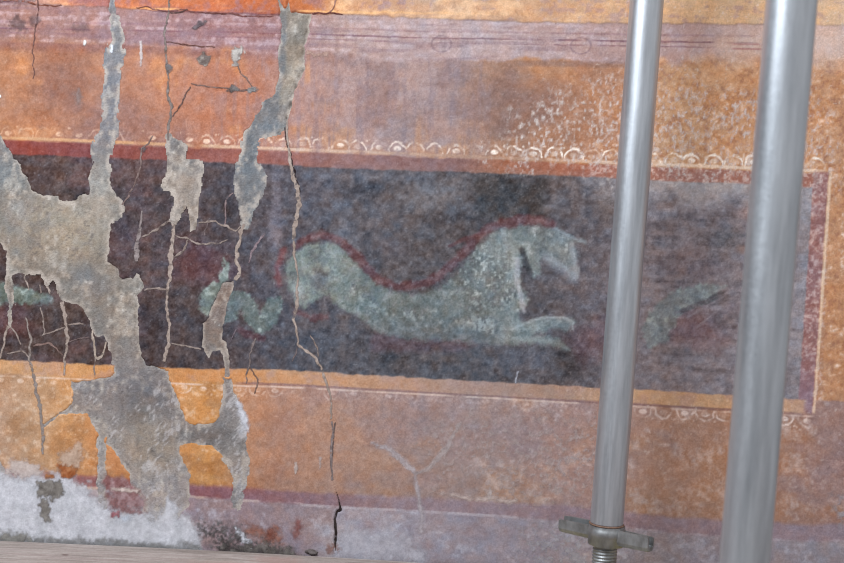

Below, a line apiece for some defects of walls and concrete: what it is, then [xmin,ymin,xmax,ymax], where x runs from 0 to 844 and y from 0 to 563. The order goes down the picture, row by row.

spalling [0,0,250,522]
damp [0,443,302,556]
crack [122,0,272,362]
damp [236,401,249,431]
spalling [233,0,312,229]
crack [284,120,342,551]